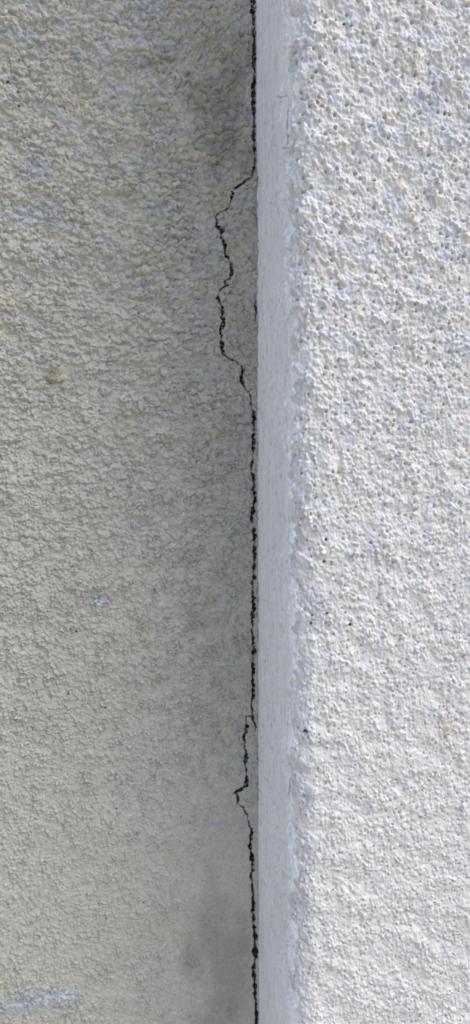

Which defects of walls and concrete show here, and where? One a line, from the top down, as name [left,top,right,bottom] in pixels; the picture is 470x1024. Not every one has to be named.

crack [215,0,291,1024]